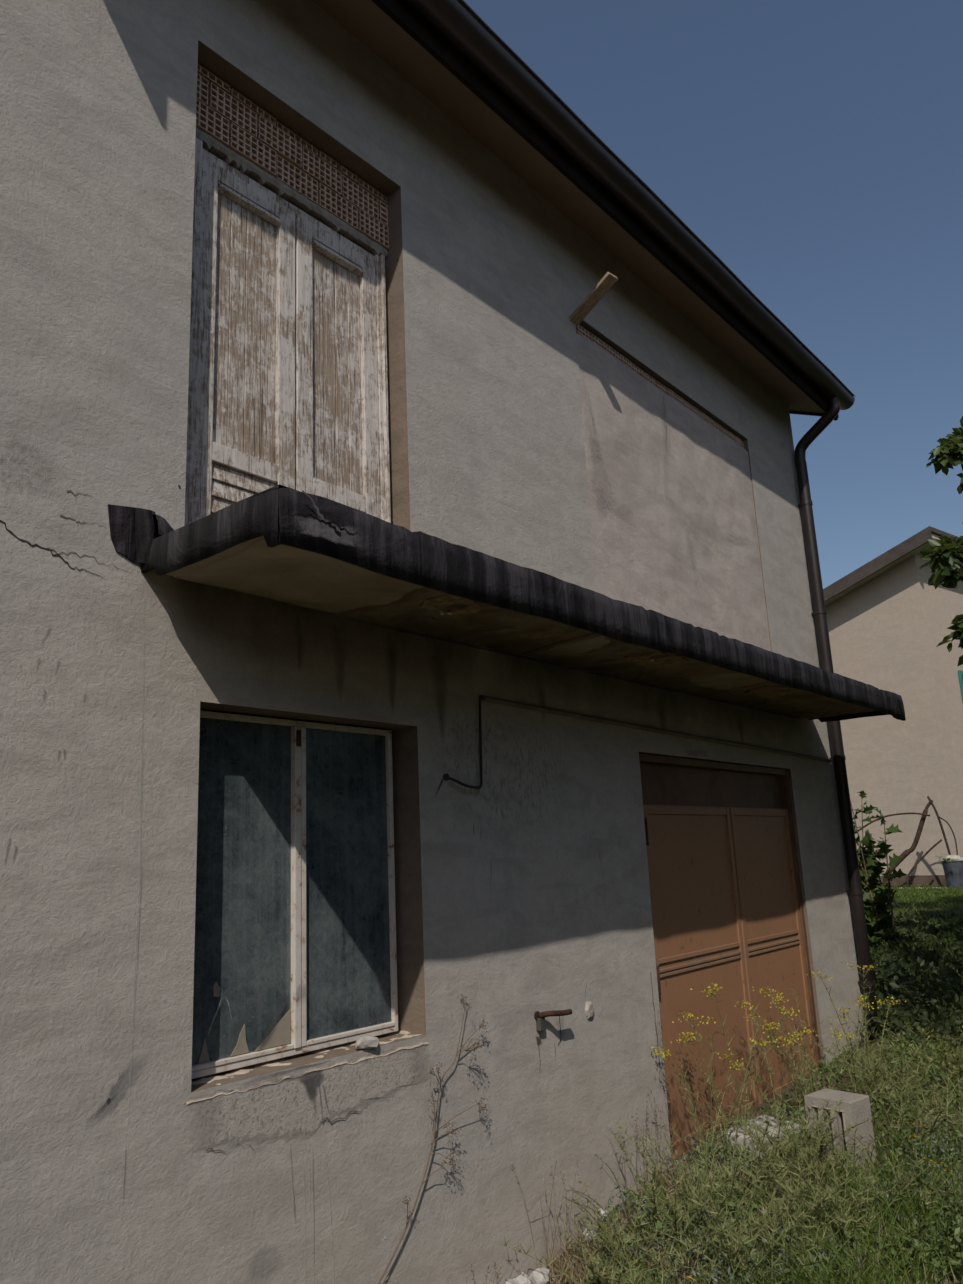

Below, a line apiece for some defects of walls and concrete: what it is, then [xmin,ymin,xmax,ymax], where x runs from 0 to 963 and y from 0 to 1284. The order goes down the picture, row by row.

crack [0,490,138,580]